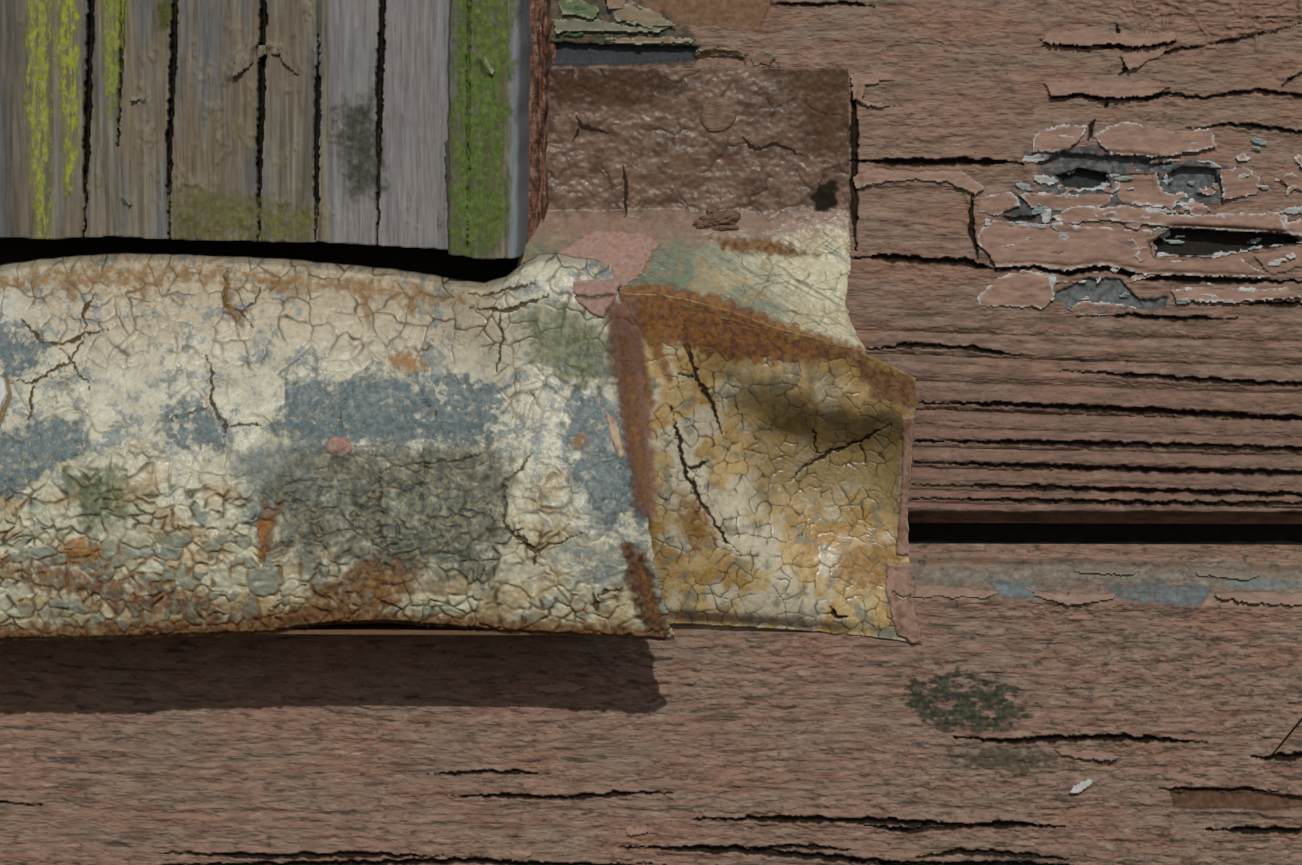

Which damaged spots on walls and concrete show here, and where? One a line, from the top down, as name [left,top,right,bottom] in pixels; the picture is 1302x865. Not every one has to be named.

crack [166,0,178,238]
crack [256,0,268,240]
peeling [549,0,776,67]
peeling [1042,29,1176,99]
peeling [810,180,838,212]
peeling [853,122,1302,317]
crack [11,293,109,420]
rust [0,261,463,324]
crack [463,283,549,372]
crack [671,344,741,556]
rust [605,284,916,517]
peeling [885,561,1302,643]